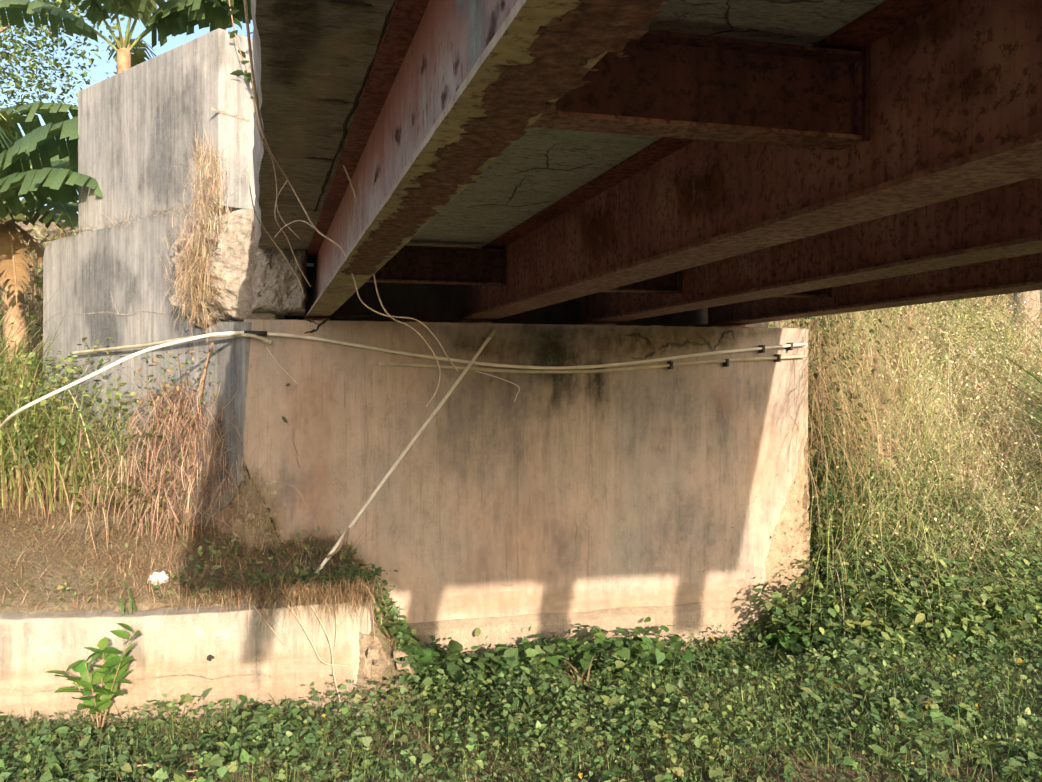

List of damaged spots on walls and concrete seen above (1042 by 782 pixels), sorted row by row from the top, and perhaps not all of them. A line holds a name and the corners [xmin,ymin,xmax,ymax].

peeling [486,0,504,47]
water stain [147,77,198,204]
rust [341,0,667,275]
crack [466,144,594,208]
spalling [169,209,308,329]
flaking render [761,441,810,629]